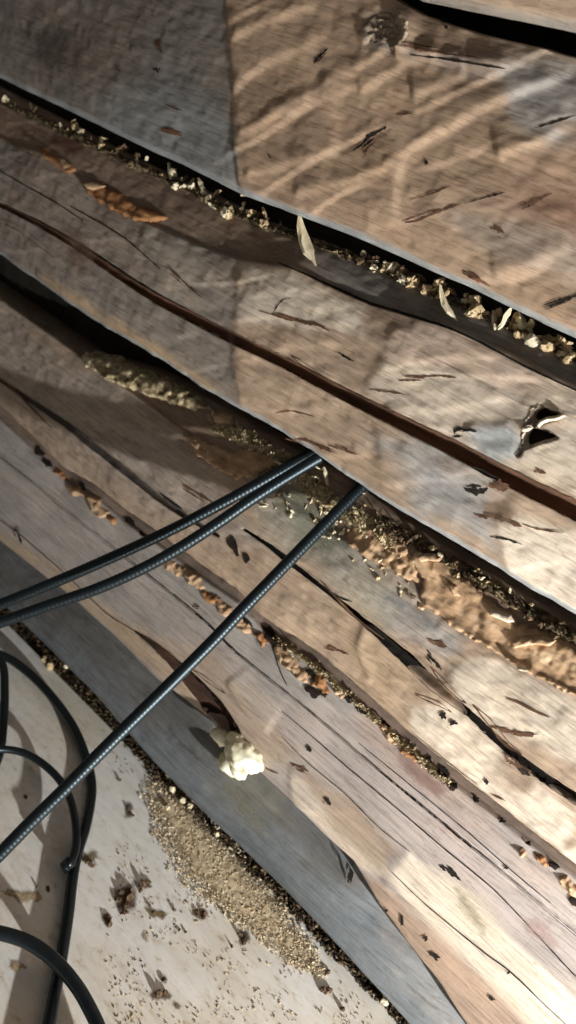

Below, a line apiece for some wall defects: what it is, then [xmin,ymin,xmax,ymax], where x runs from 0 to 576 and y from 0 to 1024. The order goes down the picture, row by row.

crack [0,171,576,537]
crack [0,456,576,977]
crack [392,873,565,1024]